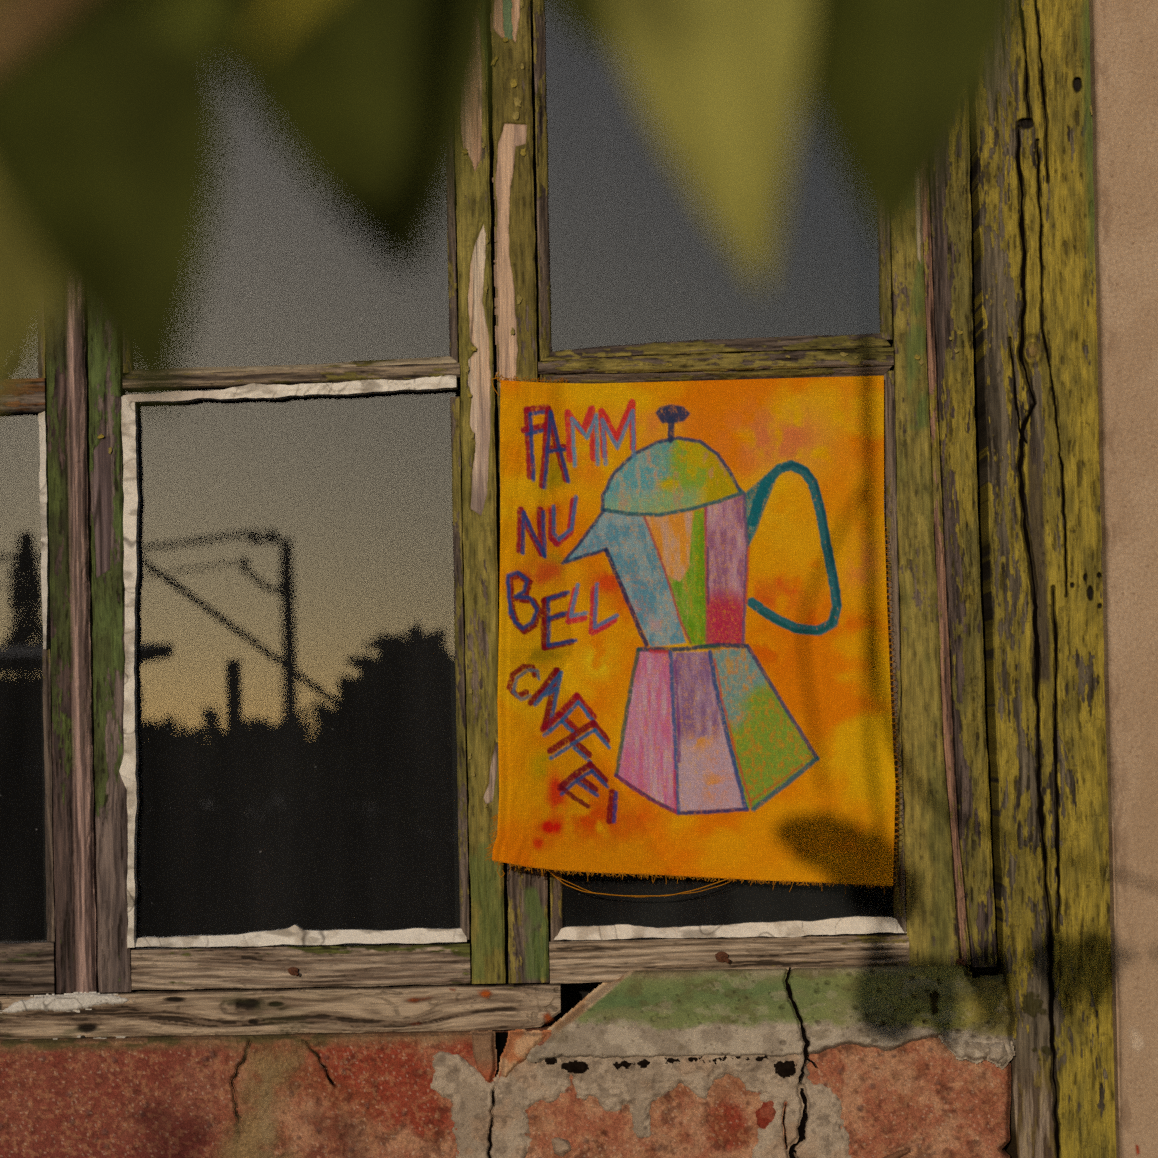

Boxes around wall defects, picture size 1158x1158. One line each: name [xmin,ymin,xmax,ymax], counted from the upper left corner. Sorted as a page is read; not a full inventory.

peeling [497,0,524,43]
peeling [465,63,527,516]
crack [1009,0,1067,1158]
spalling [469,1029,551,1083]
spalling [545,1057,589,1074]
spalling [613,1058,650,1070]
spalling [665,1055,797,1078]
crack [782,967,816,1158]
spalling [939,1035,1015,1069]
crack [487,1087,495,1158]
spalling [755,1101,776,1129]